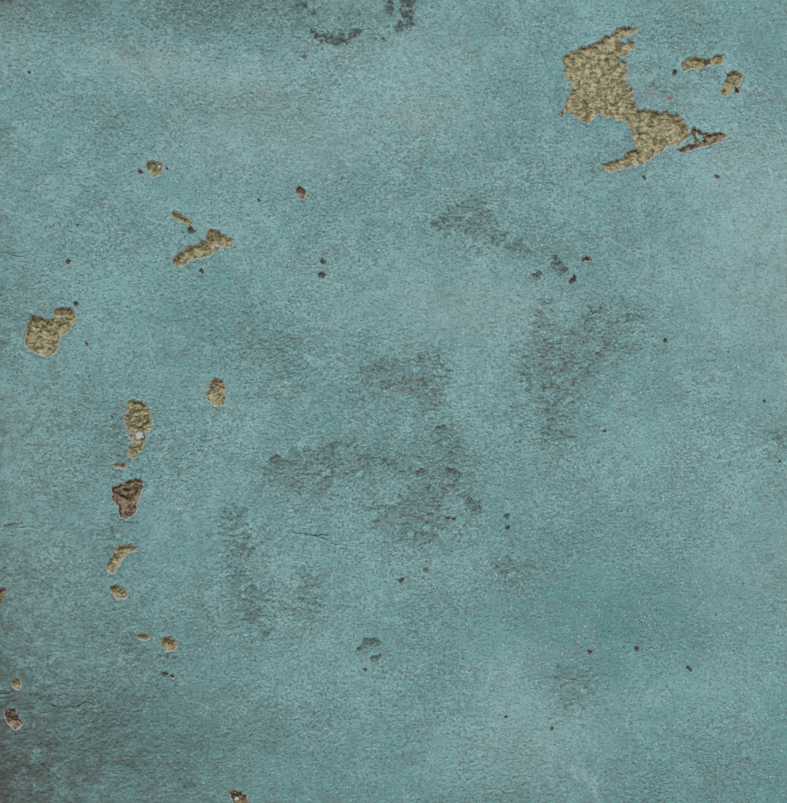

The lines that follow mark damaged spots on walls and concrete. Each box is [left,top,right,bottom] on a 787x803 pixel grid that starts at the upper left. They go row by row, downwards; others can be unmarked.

spalling [559,25,728,180]
spalling [721,70,743,97]
spalling [171,211,195,234]
spalling [172,229,234,274]
spalling [24,302,79,358]
spalling [113,399,153,470]
spalling [111,478,145,520]